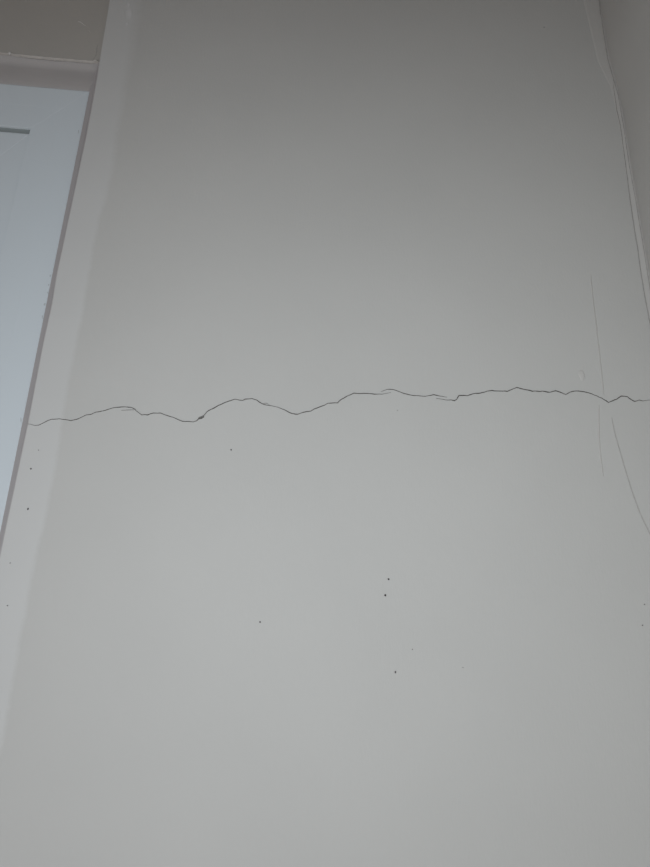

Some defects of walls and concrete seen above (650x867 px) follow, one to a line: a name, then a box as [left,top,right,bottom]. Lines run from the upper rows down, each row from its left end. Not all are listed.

crack [599,0,650,323]
crack [31,387,650,534]